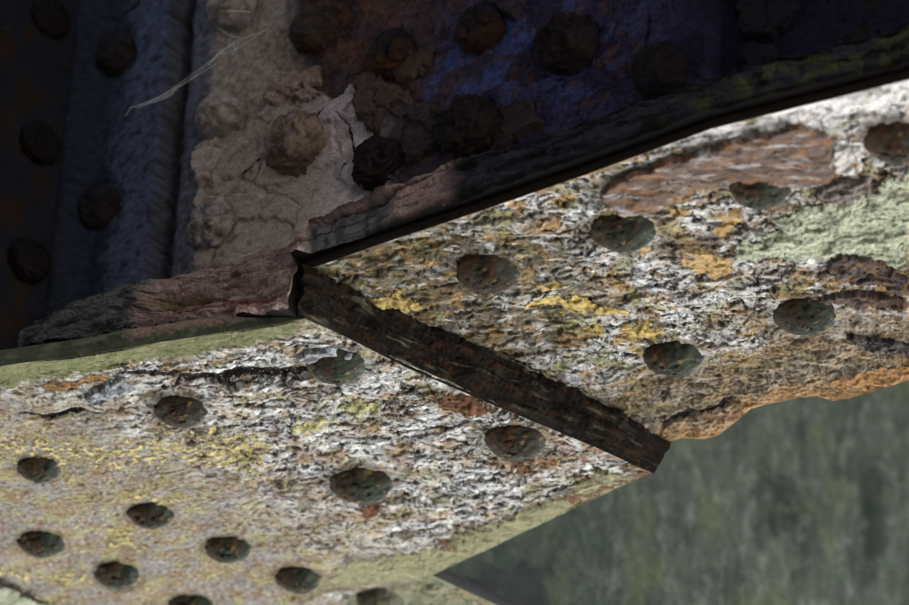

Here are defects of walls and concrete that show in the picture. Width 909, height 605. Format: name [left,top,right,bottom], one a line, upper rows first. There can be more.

peeling [599,124,873,218]
corrosion [827,358,909,392]
corrosion [424,391,499,419]
corrosion [511,459,536,475]